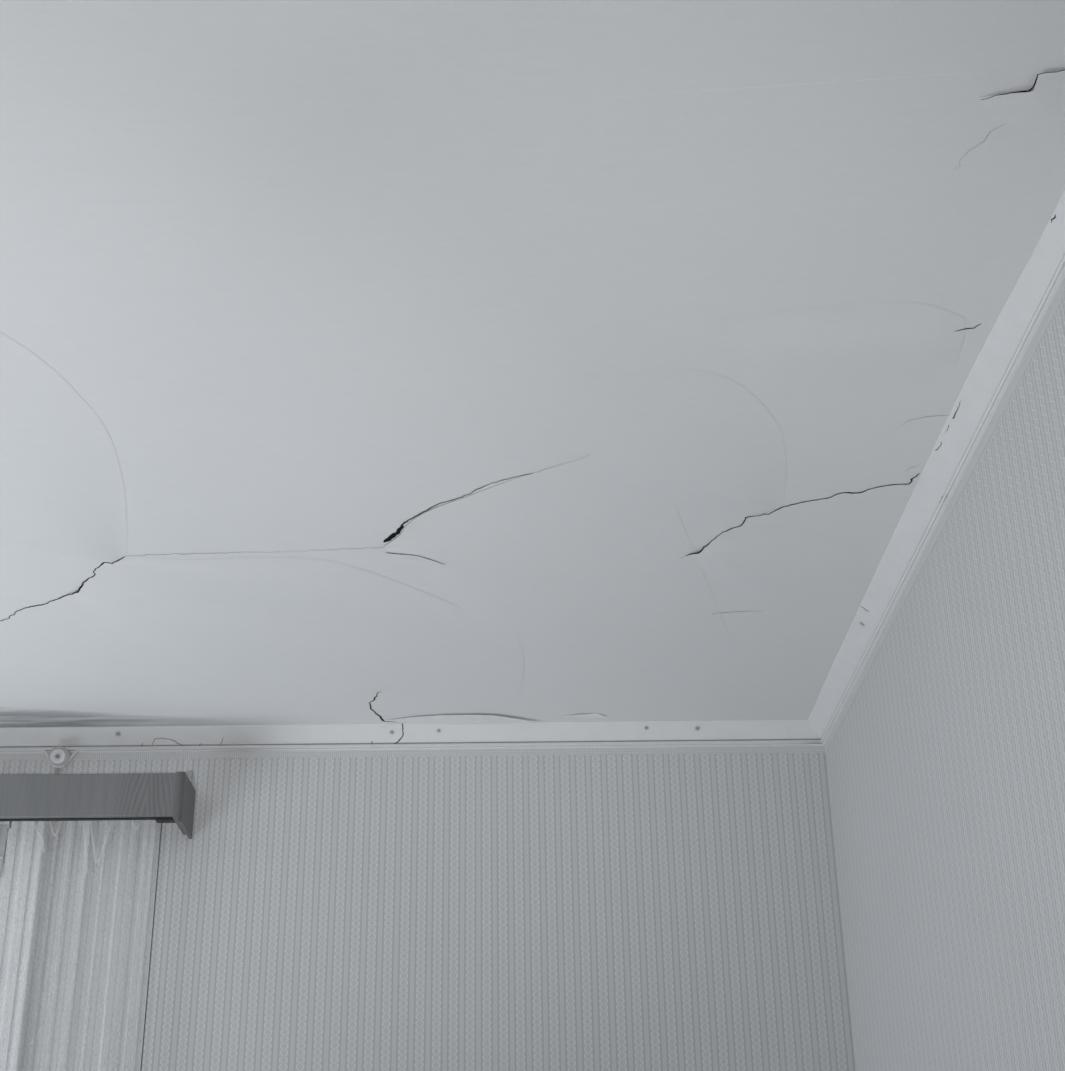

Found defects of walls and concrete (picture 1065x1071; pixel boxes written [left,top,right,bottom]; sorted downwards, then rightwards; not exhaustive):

crack [302,454,590,564]
crack [682,466,920,558]
crack [1,552,240,621]